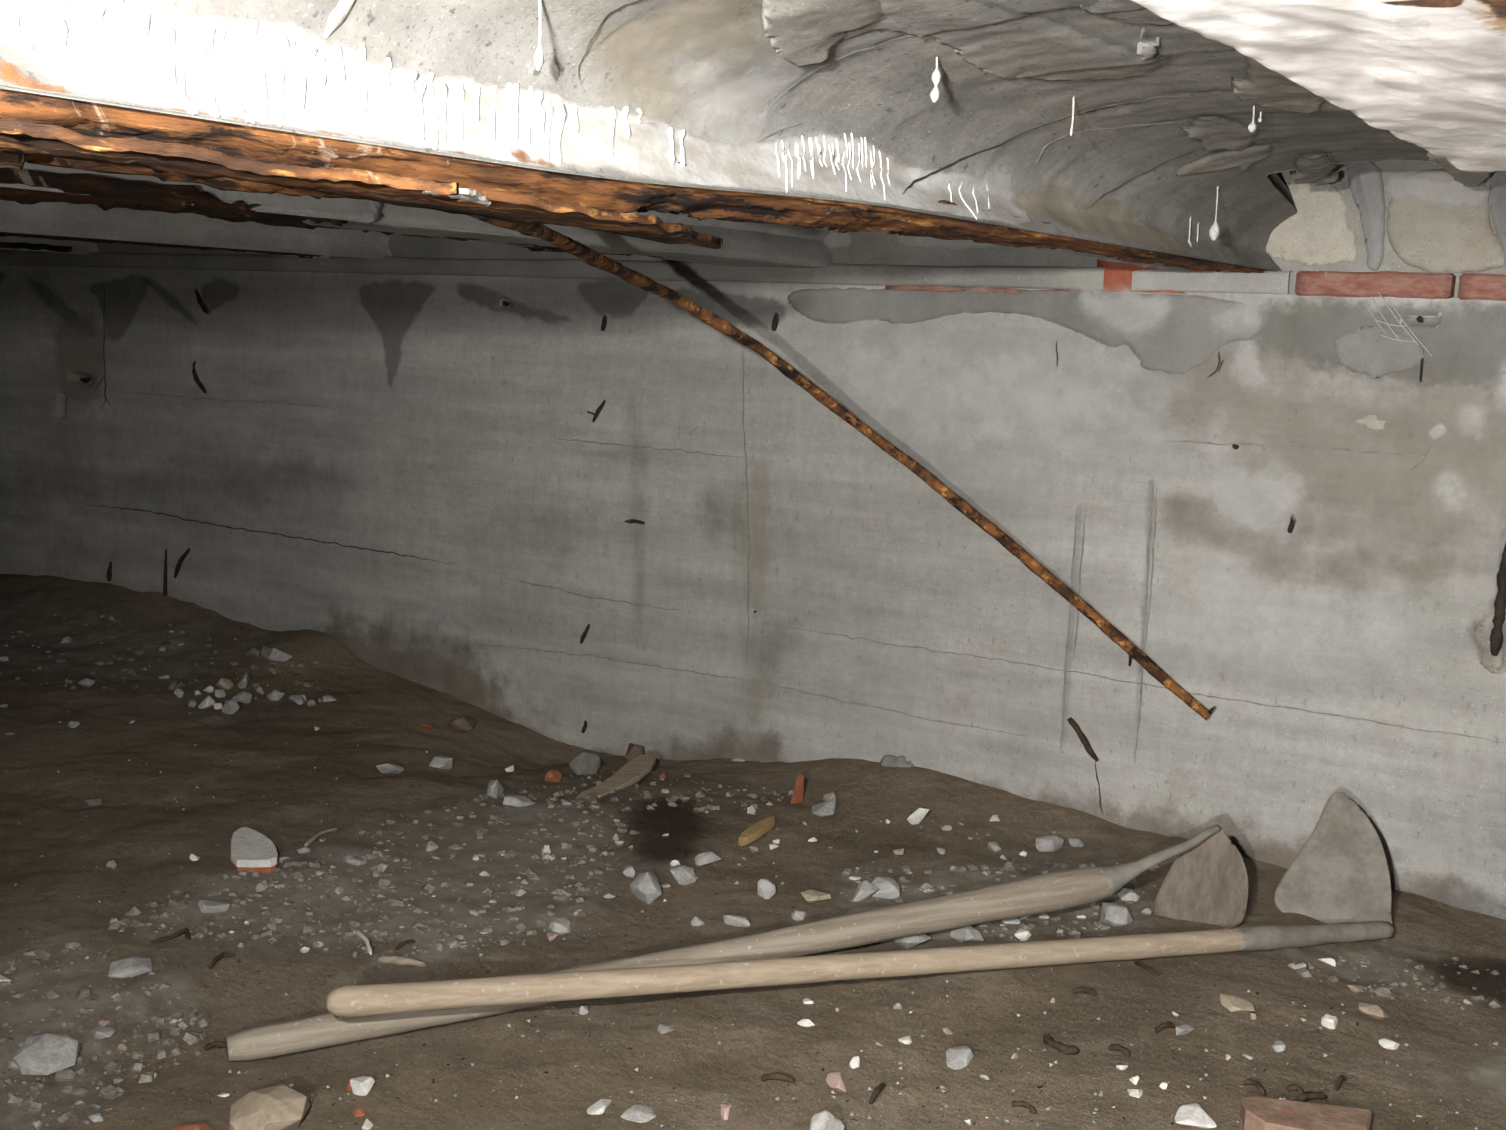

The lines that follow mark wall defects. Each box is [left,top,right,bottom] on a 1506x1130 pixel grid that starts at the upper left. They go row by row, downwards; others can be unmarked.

crack [578,0,641,81]
corrosion [1383,0,1506,30]
damp [0,0,1205,255]
crack [902,96,1203,194]
crack [1090,148,1205,208]
peeling [1290,154,1339,186]
peeling [1427,151,1490,187]
damp [30,278,239,339]
damp [360,282,434,384]
corrosion [422,188,1215,720]
spalling [1470,604,1506,674]
corrosion [1490,543,1506,656]